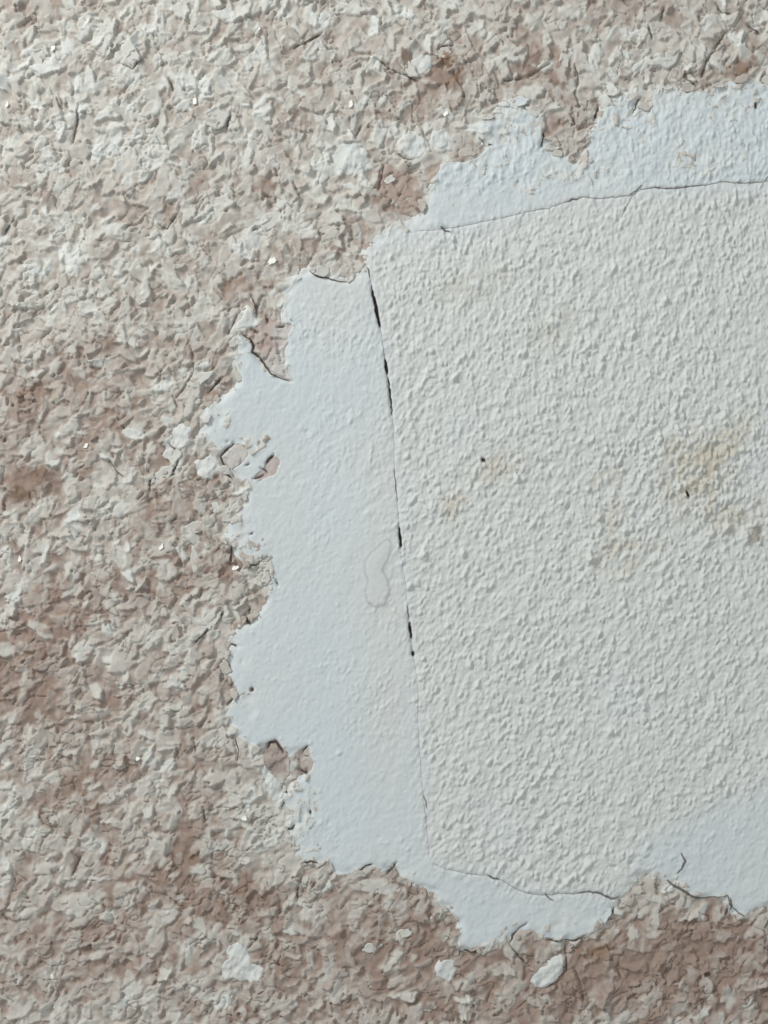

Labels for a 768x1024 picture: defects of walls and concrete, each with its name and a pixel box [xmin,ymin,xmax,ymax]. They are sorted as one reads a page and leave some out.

crack [422,176,768,232]
crack [367,268,381,327]
crack [384,359,393,414]
peeling [148,74,768,957]
crack [406,606,414,656]
crack [578,891,619,900]
crack [667,854,744,916]